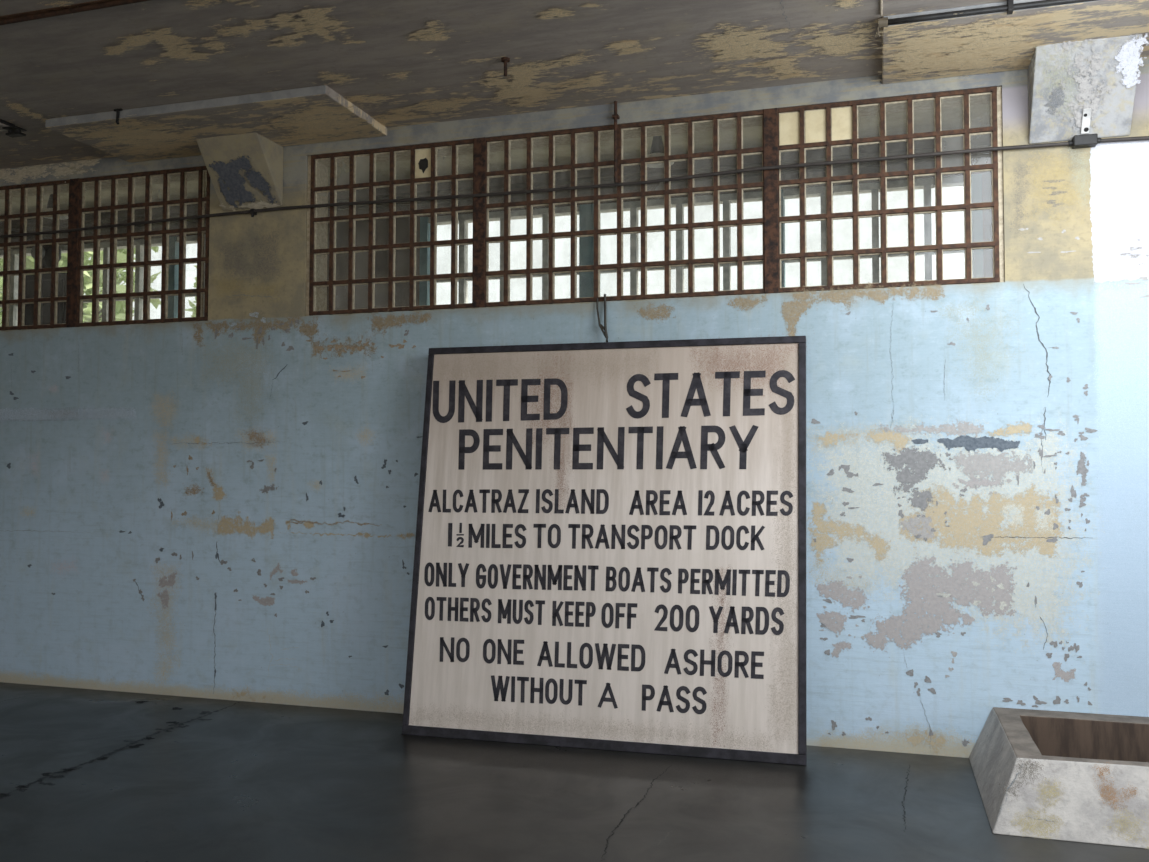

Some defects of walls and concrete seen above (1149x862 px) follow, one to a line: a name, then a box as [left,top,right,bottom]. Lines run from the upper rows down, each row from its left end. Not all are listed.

peeling [101,0,365,68]
peeling [317,36,655,126]
spalling [691,0,1149,253]
spalling [209,155,280,211]
peeling [205,312,416,360]
crack [1023,284,1059,465]
peeling [170,507,415,540]
peeling [806,411,1098,658]
peeling [233,558,316,617]
crack [0,593,240,798]
peeling [906,664,936,696]
peeling [1003,641,1092,707]